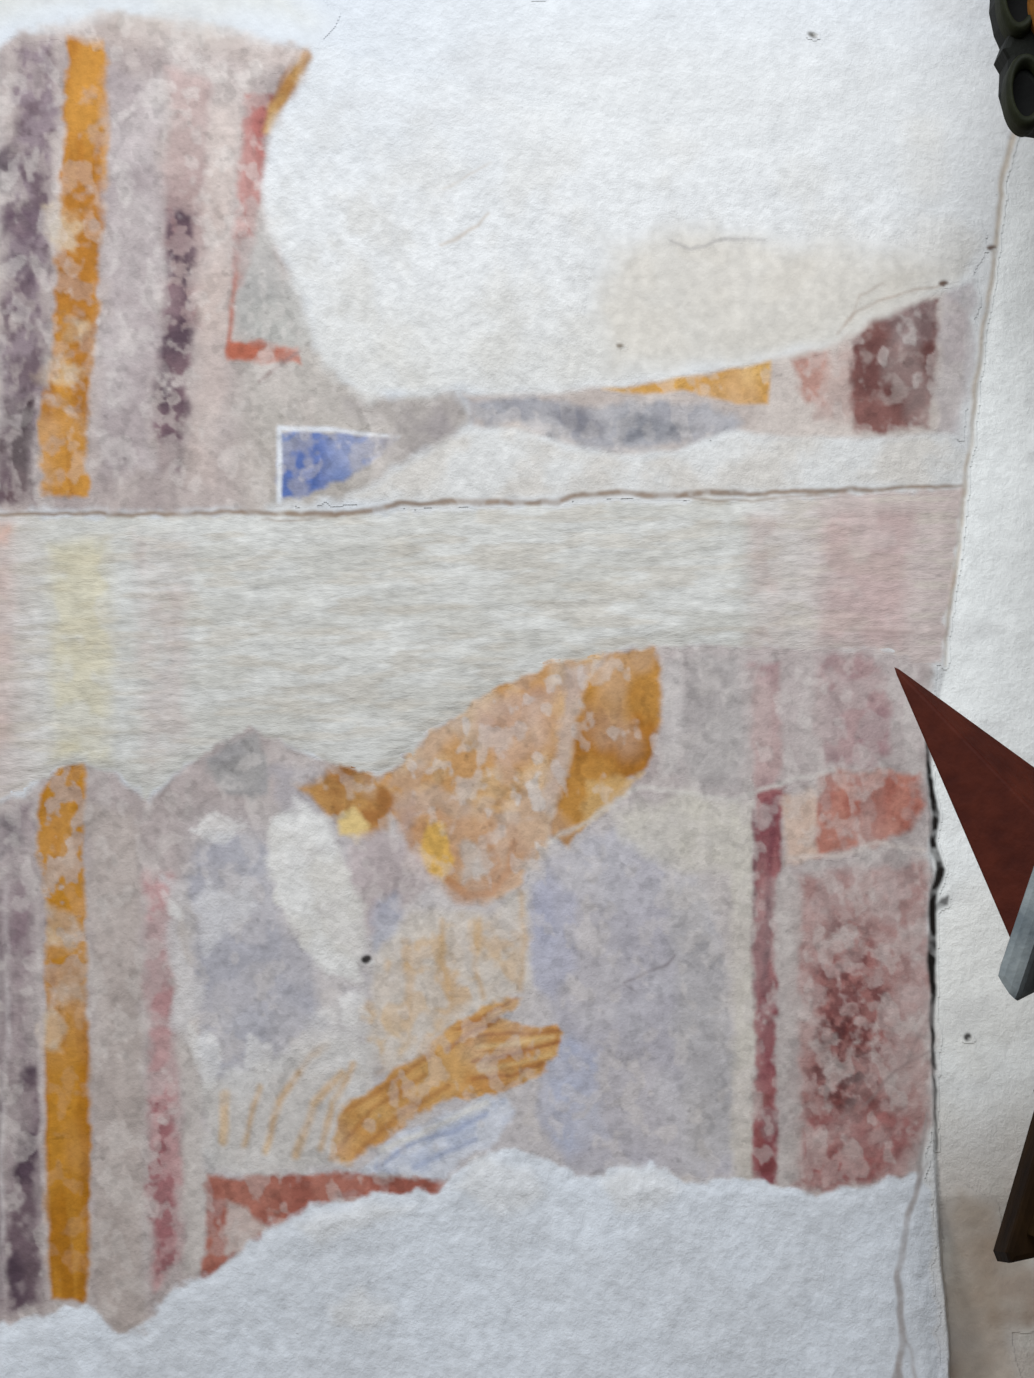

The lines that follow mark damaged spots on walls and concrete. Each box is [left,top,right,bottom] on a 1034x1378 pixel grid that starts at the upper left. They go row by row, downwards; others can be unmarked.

crack [0,130,1019,670]
crack [604,952,678,996]
crack [857,739,952,1378]